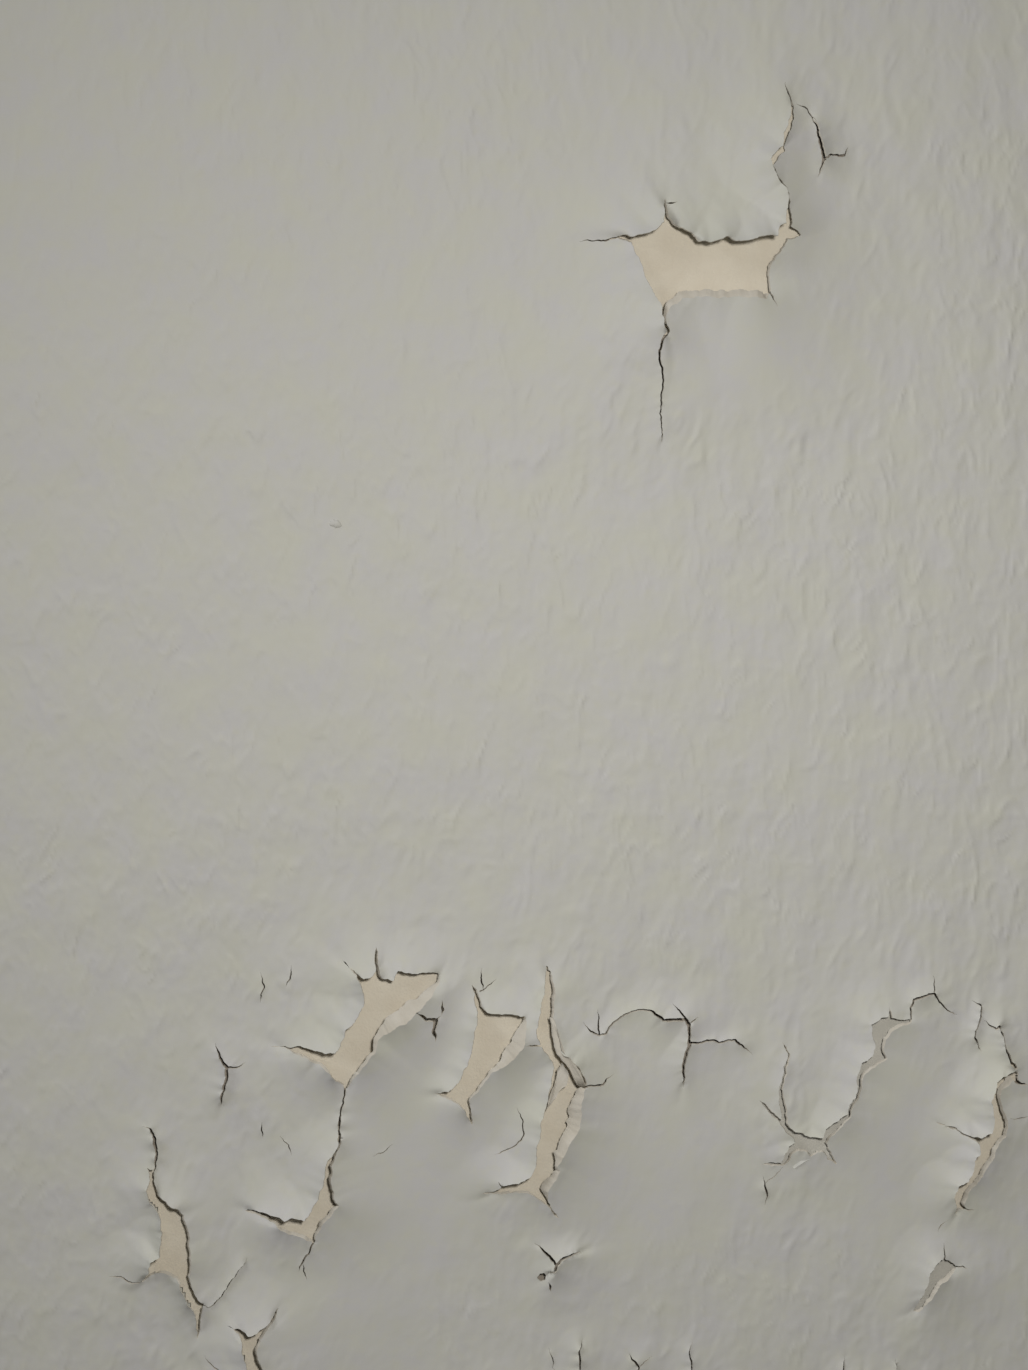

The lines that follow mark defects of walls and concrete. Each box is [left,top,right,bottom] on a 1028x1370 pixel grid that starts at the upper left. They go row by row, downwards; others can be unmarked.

peeling [467,0,941,511]
peeling [58,840,1028,1370]
crack [501,1234,631,1325]
crack [583,965,763,1136]